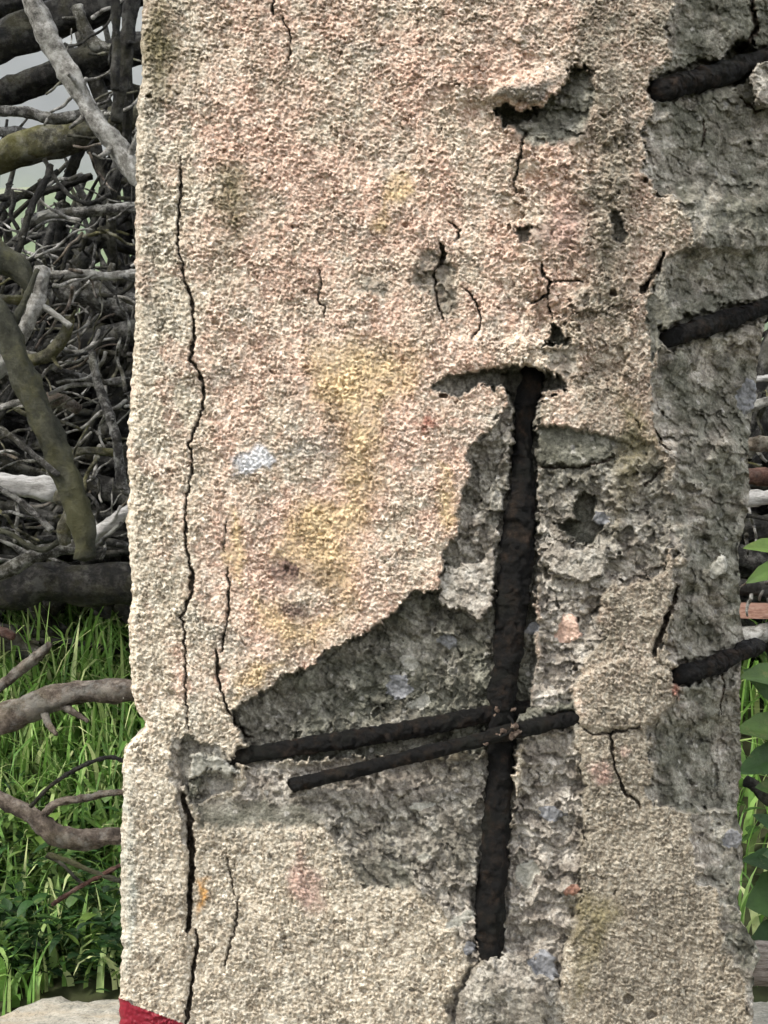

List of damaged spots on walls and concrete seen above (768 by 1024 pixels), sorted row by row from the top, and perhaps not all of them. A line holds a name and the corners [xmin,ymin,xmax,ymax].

crack [175,157,206,729]
crack [432,222,461,321]
crack [465,289,482,340]
spalling [228,0,768,748]
crack [512,132,528,193]
crack [531,263,584,319]
crack [216,521,254,739]
crack [181,792,200,1024]
spalling [170,723,489,1024]
spalling [500,726,589,987]
crack [583,725,641,809]
spalling [644,662,761,1020]